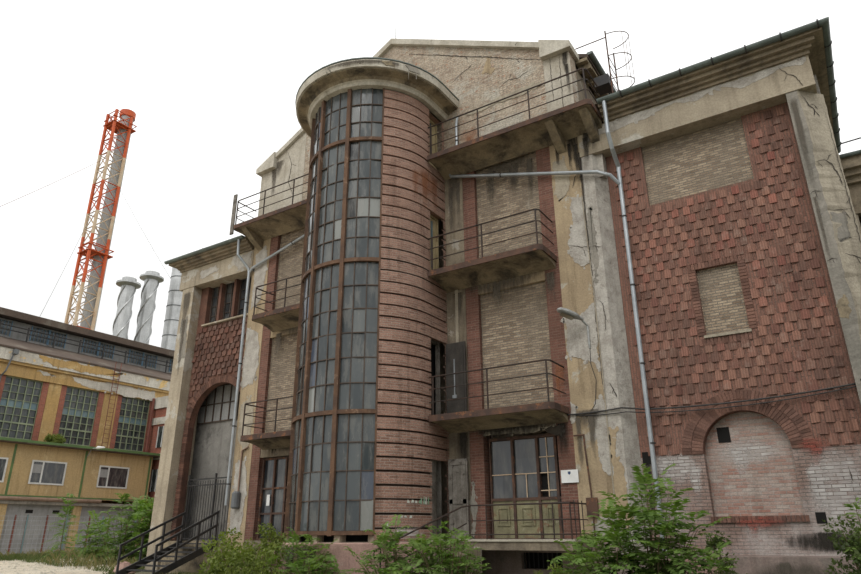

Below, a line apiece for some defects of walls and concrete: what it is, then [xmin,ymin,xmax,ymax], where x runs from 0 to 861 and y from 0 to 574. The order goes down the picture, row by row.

crack [779,68,861,263]
flaking render [560,302,601,372]
peeling [37,355,155,401]